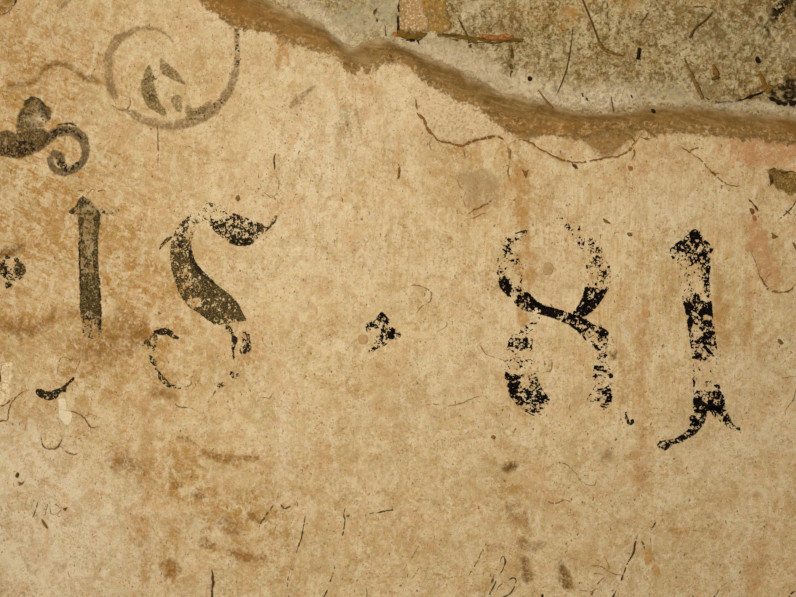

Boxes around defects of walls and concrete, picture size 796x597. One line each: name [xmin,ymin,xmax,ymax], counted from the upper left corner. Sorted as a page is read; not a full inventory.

spalling [266,0,796,117]
peeling [416,93,506,143]
crack [415,99,651,179]
crack [0,391,25,422]